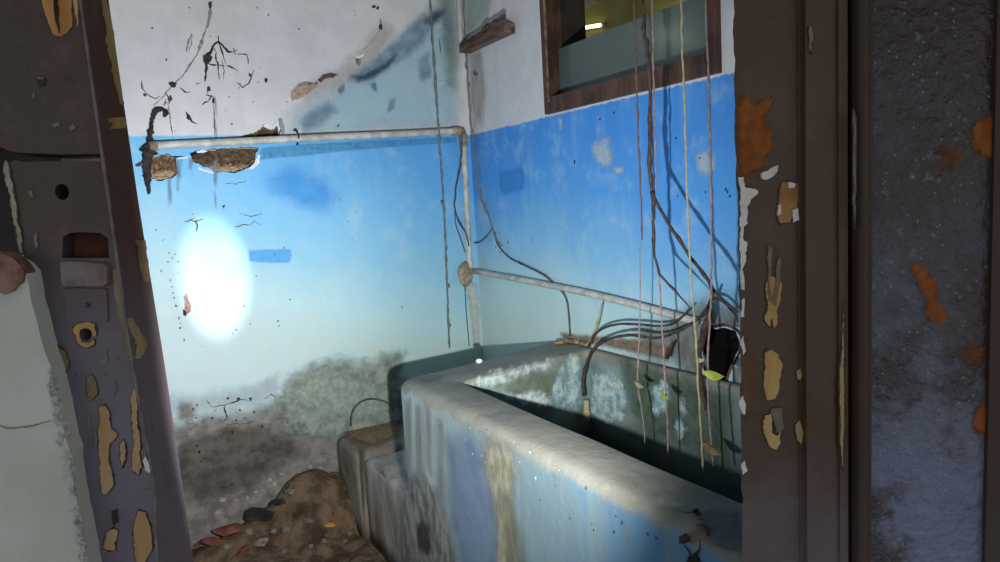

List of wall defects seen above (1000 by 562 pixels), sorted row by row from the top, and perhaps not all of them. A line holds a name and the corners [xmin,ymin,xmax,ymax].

crack [141,2,268,138]
damp [296,0,457,129]
flaking render [151,118,285,179]
corrosion [737,97,774,187]
corrosion [972,113,992,158]
peeling [725,165,799,329]
corrosion [911,263,949,324]
peeling [85,374,150,496]
damp [174,353,495,562]
damp [476,355,626,424]
damp [652,380,670,415]
peeling [761,349,803,451]